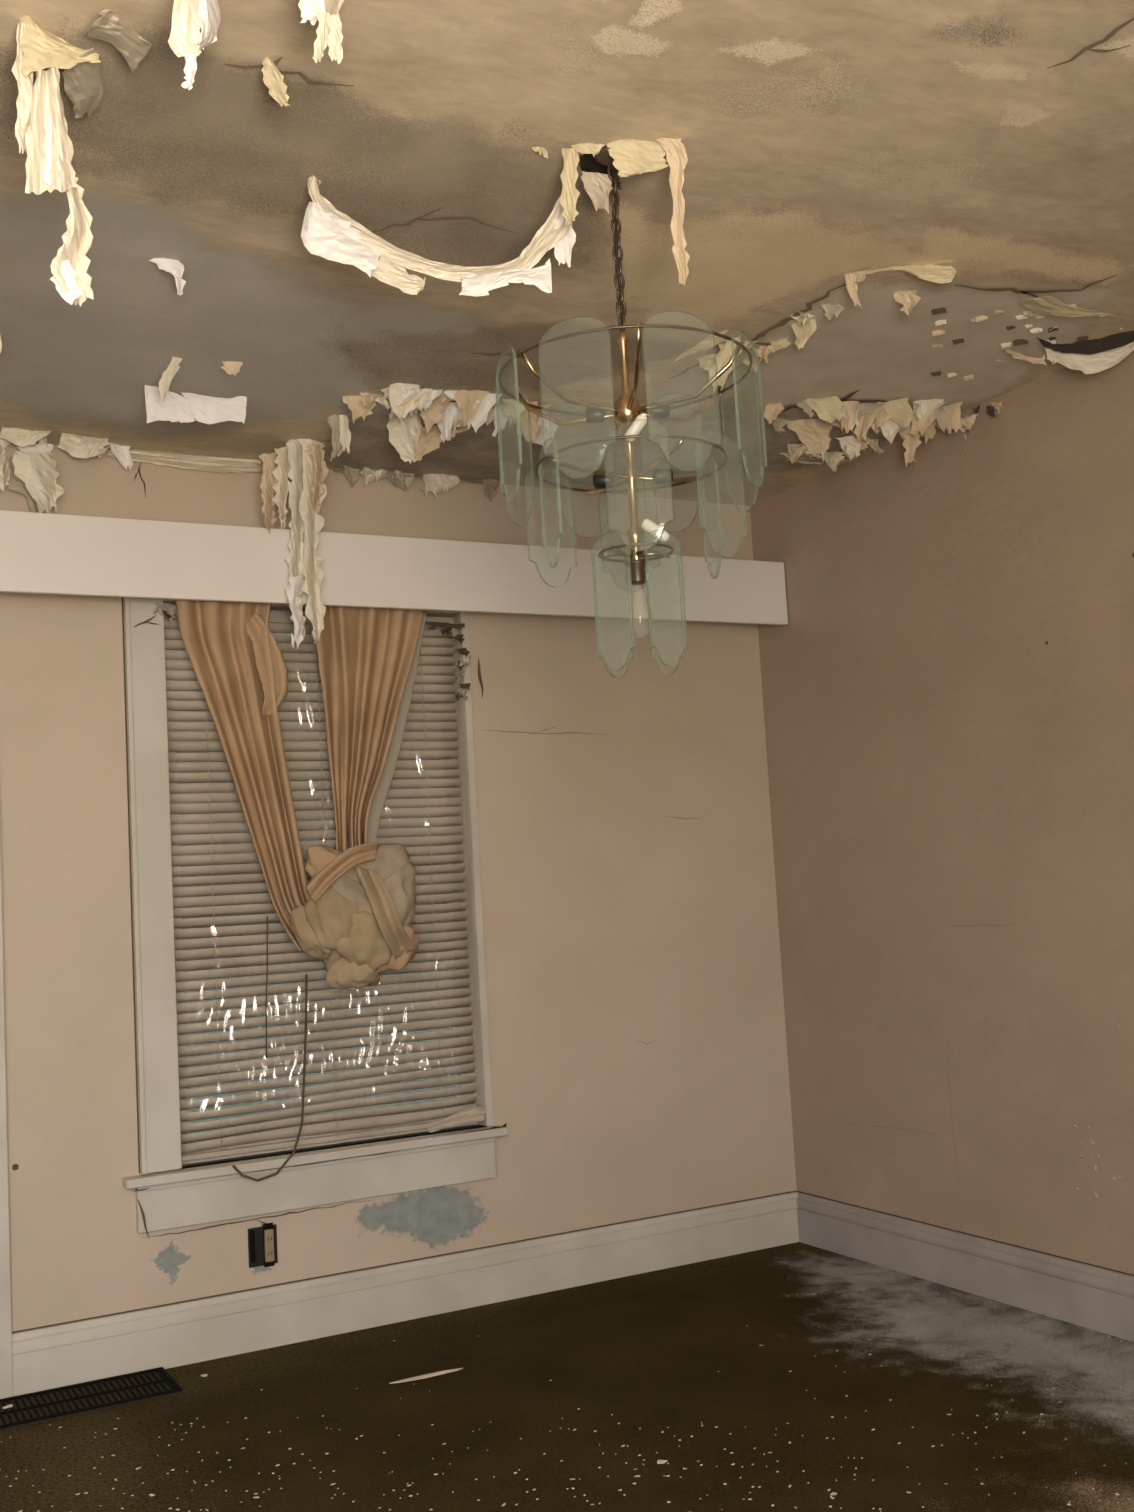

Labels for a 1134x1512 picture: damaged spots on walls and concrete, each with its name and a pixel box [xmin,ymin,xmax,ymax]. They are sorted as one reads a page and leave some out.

damp [930,14,1033,49]
crack [1048,17,1134,68]
peeling [12,0,221,307]
damp [0,7,720,442]
peeling [970,296,1134,374]
flaking render [0,138,1003,649]
peeling [354,1185,491,1255]
peeling [151,1239,191,1285]